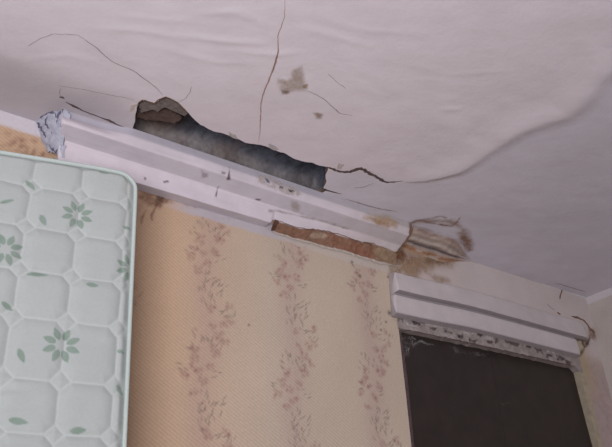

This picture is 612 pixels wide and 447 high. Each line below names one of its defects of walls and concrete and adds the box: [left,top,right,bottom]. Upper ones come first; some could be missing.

crack [67,34,163,95]
crack [258,10,285,142]
crack [59,86,133,127]
spalling [36,109,70,158]
spalling [130,104,326,195]
crack [326,167,400,212]
spalling [271,219,479,266]
water stain [396,251,444,275]
crack [547,283,596,354]